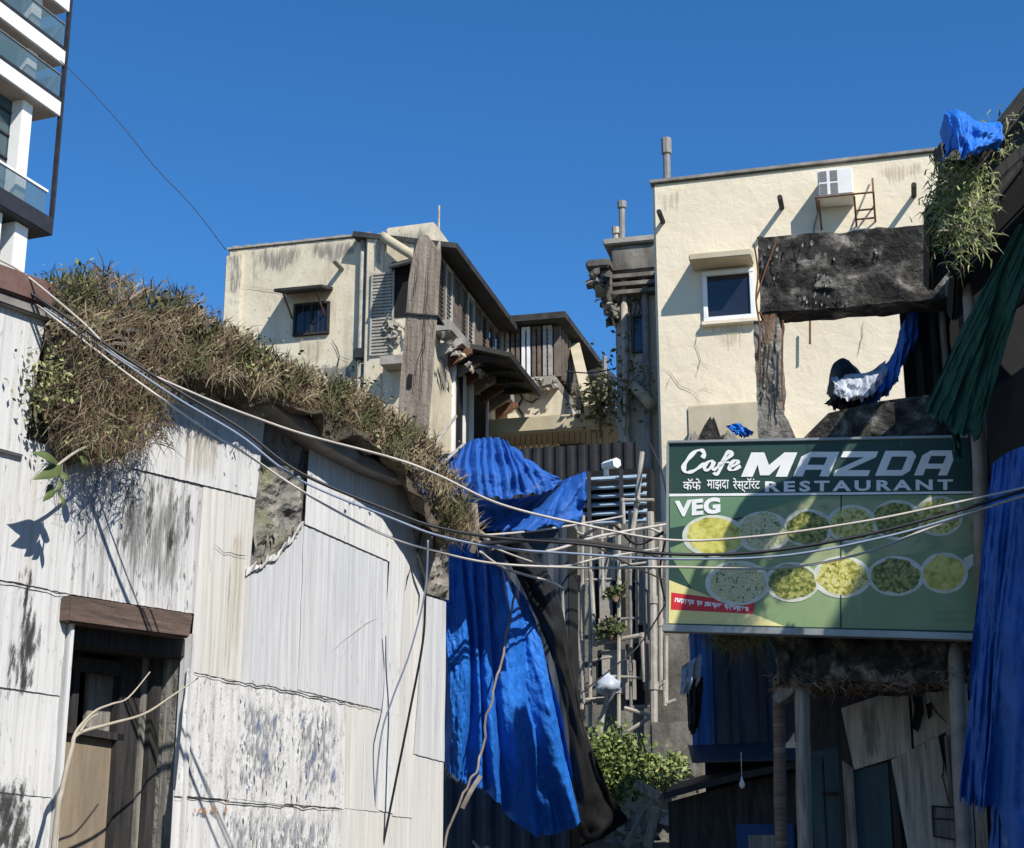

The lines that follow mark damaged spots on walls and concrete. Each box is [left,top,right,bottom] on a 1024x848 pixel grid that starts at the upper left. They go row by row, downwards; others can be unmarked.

water stain [230,253,241,292]
water stain [124,478,191,584]
peeling [249,423,306,574]
water stain [8,569,42,694]